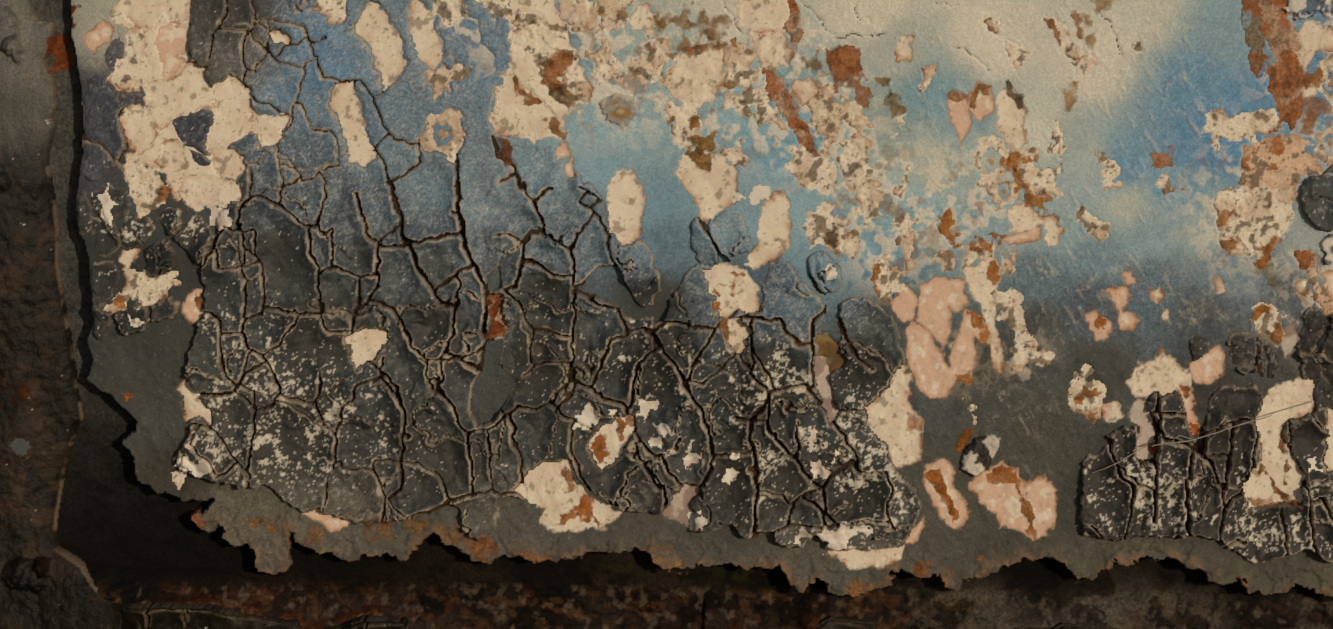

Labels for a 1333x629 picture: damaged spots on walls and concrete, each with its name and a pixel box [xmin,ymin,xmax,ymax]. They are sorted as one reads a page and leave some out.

peeling [84,0,291,219]
corrosion [762,65,822,157]
corrosion [783,0,804,42]
corrosion [804,45,906,117]
peeling [1200,0,1333,270]
corrosion [1240,0,1331,170]
crack [76,0,922,551]
peeling [313,0,1110,571]
peeling [1067,345,1225,460]
crack [1078,306,1333,564]
peeling [1242,376,1333,508]
crack [113,607,298,629]